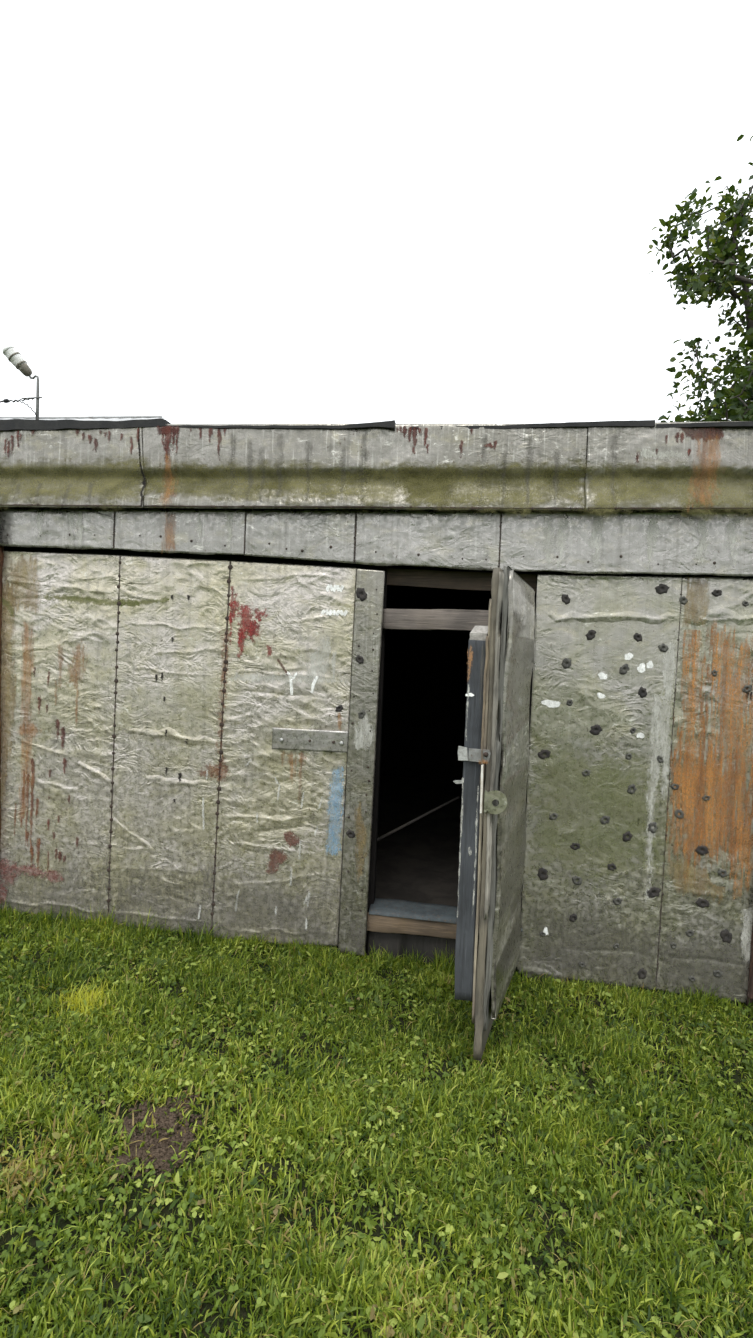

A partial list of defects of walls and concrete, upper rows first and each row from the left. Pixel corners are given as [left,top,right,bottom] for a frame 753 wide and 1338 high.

rust [4,430,34,457]
crack [138,427,146,507]
rust [157,426,226,462]
rust [656,427,724,479]
rust [1,556,87,876]
rust [667,578,753,900]
peeling [741,908,753,960]